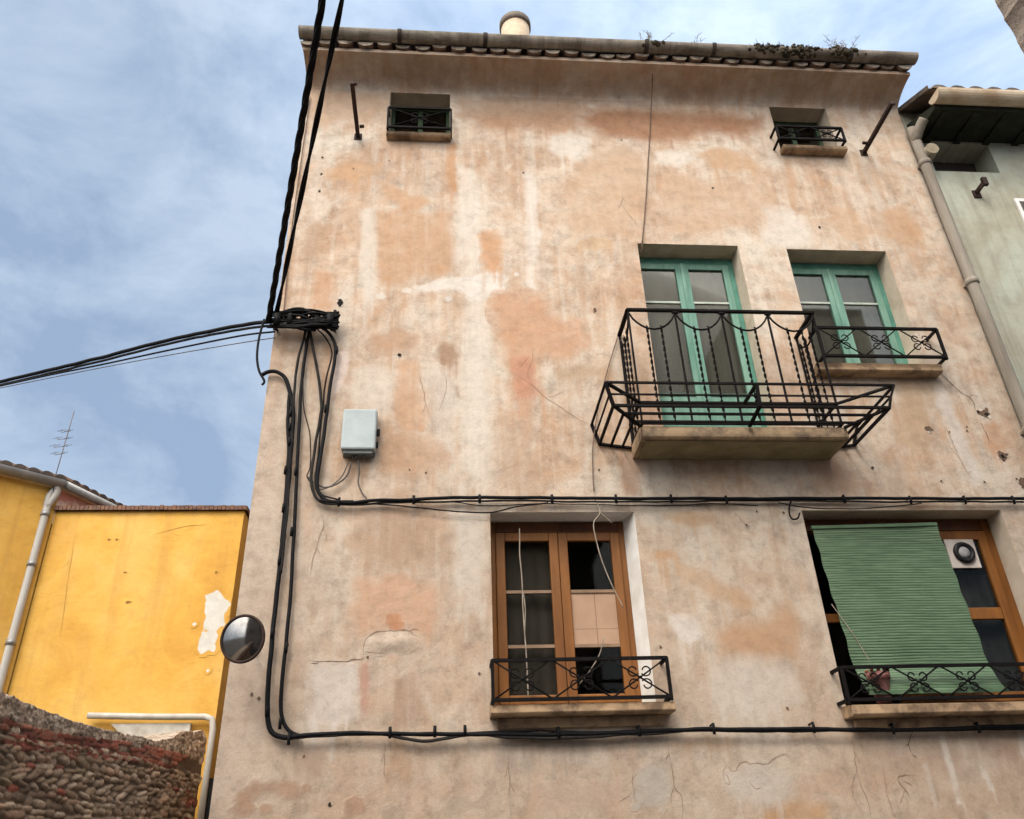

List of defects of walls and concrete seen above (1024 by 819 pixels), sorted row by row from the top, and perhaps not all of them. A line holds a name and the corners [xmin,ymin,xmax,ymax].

peeling [190,571,232,675]
crack [312,628,418,664]
crack [723,754,783,789]